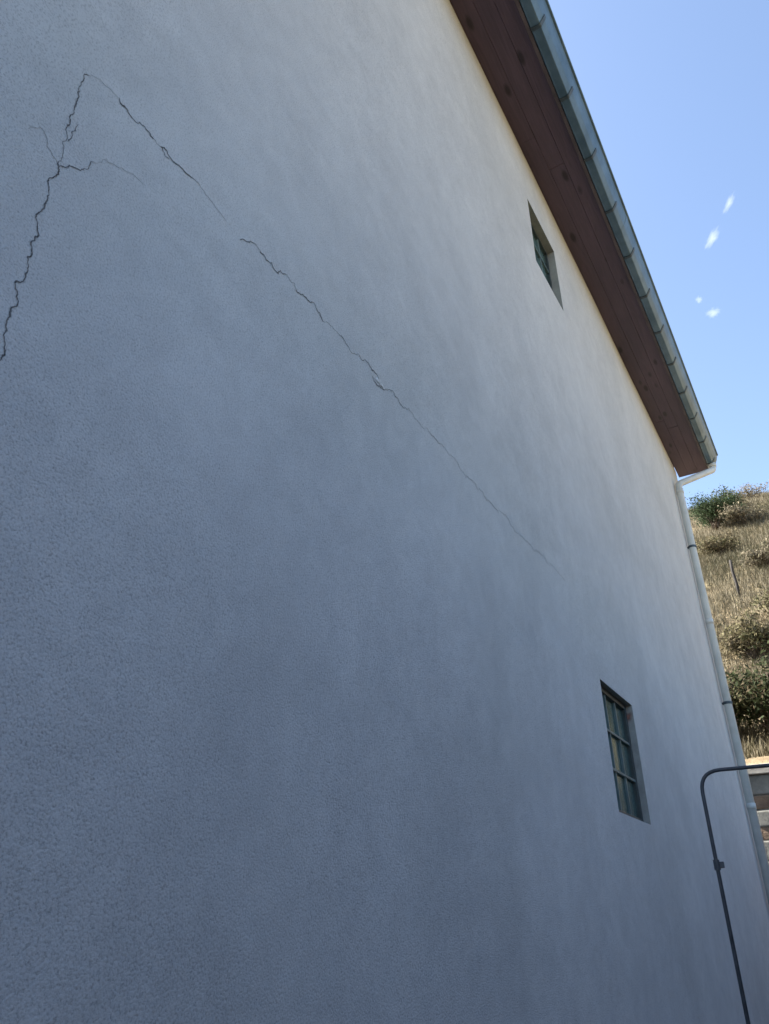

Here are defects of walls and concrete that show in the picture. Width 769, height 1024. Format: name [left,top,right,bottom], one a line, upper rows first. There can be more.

crack [0,74,223,360]
crack [240,239,558,572]